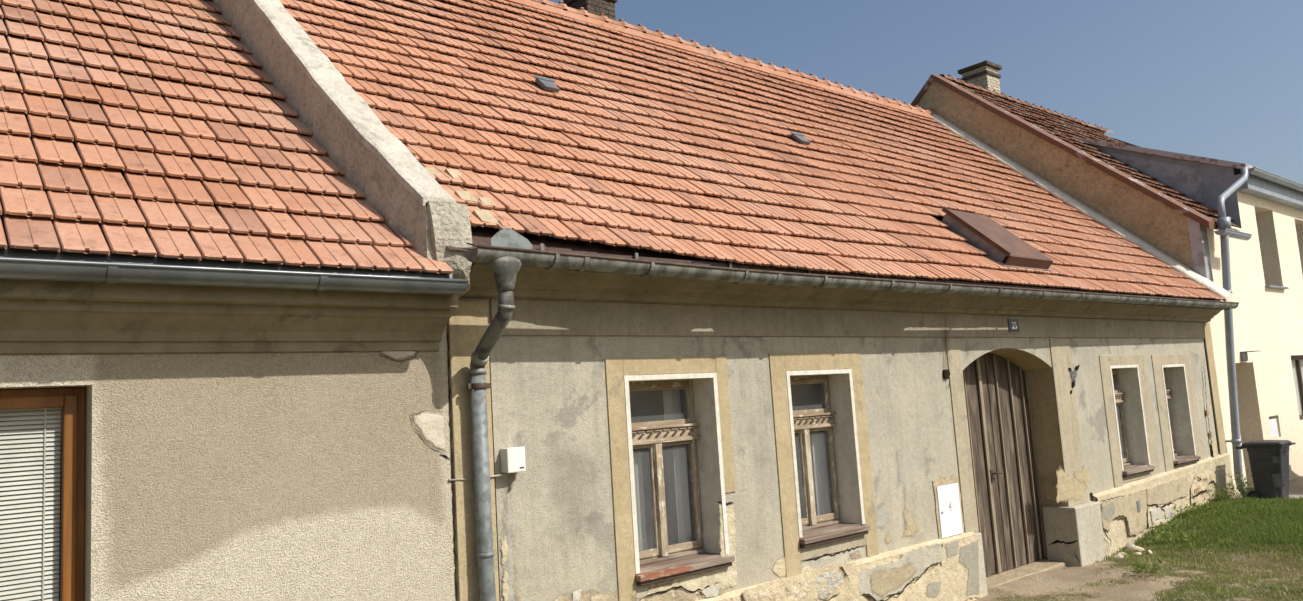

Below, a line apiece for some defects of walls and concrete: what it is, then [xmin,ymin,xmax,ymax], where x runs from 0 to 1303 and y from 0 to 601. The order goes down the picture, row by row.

spalling [1147,469,1222,528]
spalling [554,589,618,601]
spalling [637,504,867,601]
crack [803,546,941,601]